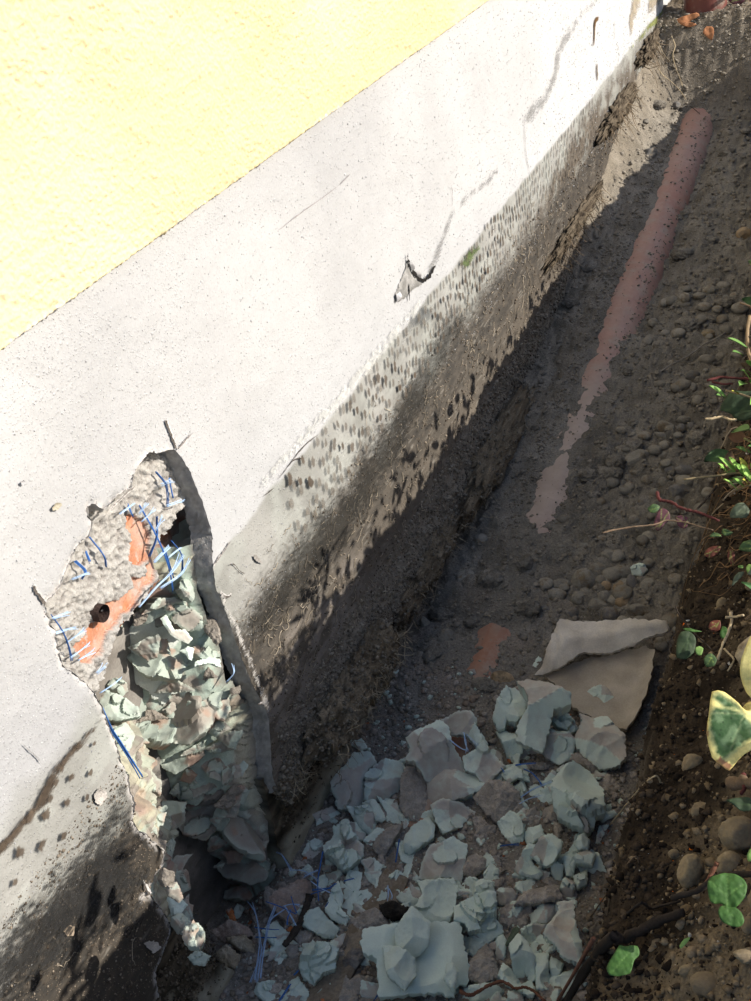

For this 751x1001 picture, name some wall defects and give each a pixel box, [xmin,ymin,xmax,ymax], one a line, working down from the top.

peeling [394,255,436,302]
damp [288,104,598,532]
flaking render [45,453,191,693]
damp [0,727,96,858]
damp [0,784,151,1001]
flaking render [94,788,108,806]